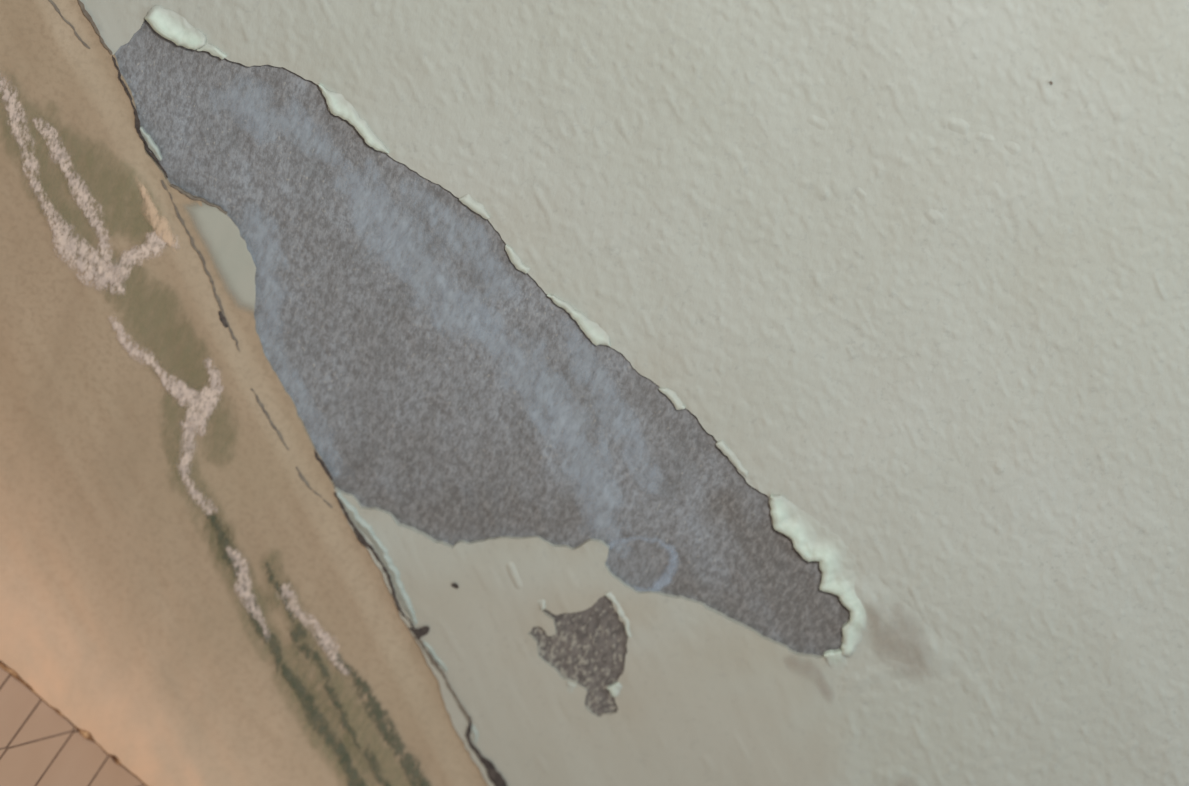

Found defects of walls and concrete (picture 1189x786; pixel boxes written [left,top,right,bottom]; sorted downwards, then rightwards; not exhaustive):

water stain [0,78,177,294]
water stain [109,317,429,786]
peeling [112,5,867,670]
peeling [529,592,631,716]